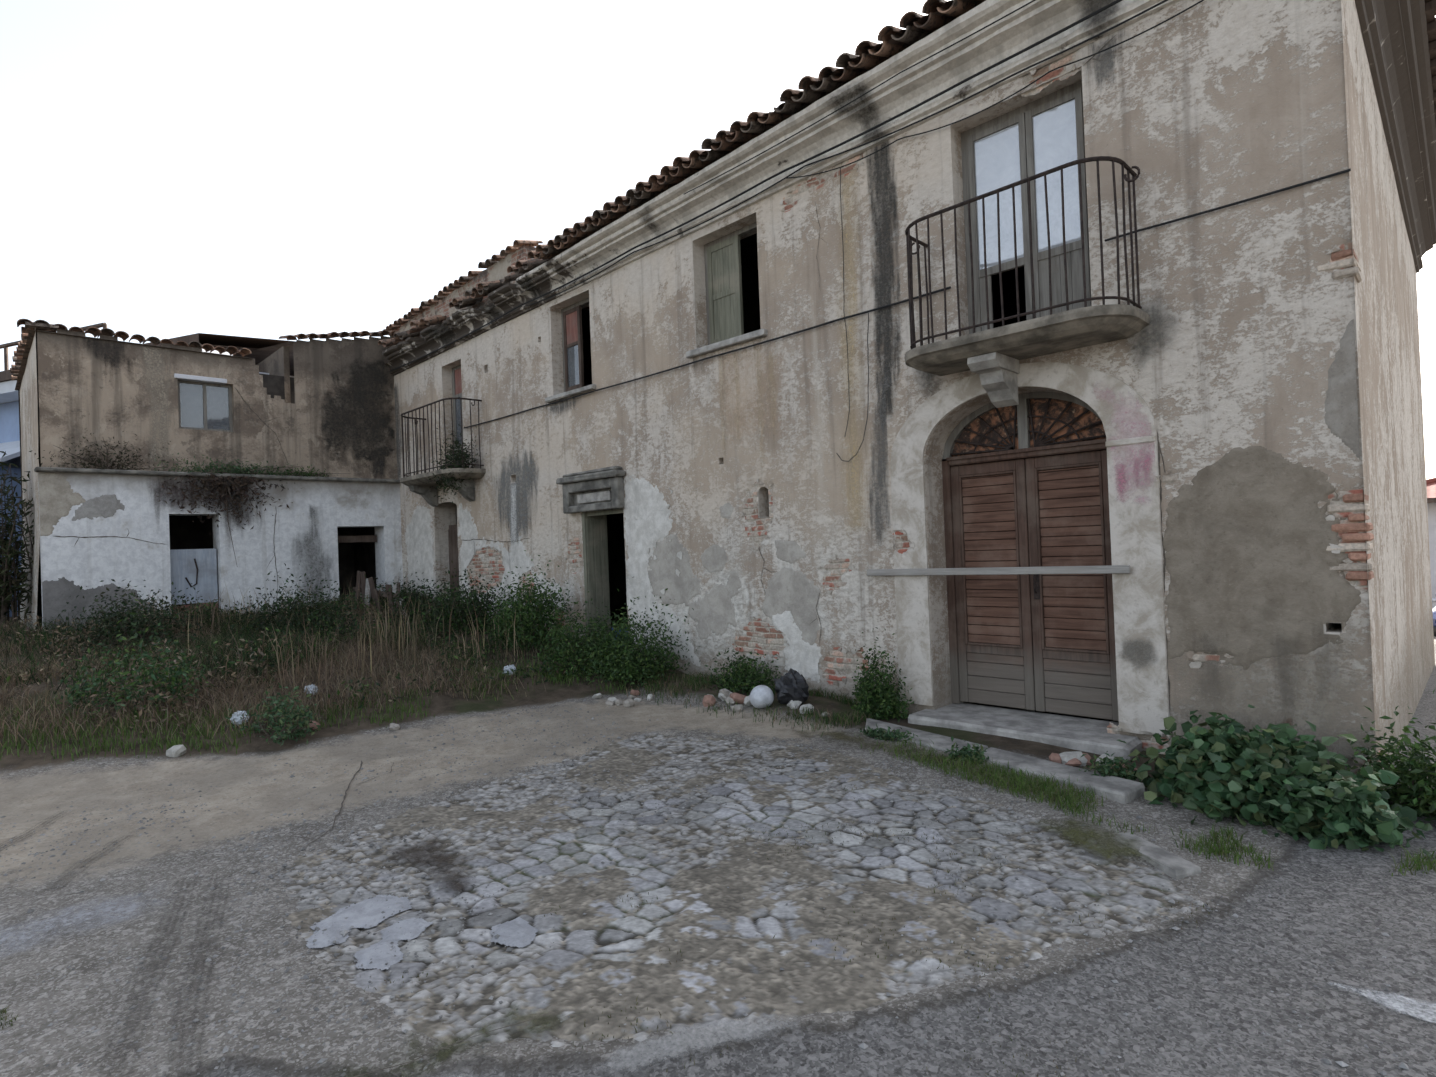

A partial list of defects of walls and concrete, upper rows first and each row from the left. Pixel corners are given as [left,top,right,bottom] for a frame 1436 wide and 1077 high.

spalling [1317,242,1362,283]
damp [833,85,900,540]
damp [321,361,401,478]
damp [498,452,536,541]
peeling [457,503,582,630]
peeling [623,474,700,666]
spalling [740,479,774,550]
spalling [818,554,855,594]
spalling [1318,488,1375,591]
peeling [732,611,868,687]
spalling [1187,654,1220,668]